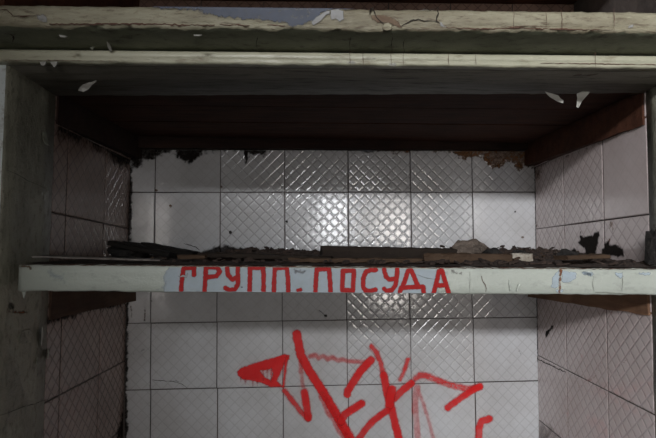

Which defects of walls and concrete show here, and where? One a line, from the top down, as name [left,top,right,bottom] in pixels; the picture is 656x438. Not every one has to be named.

peeling [154,6,349,27]
crack [391,7,598,65]
peeling [576,91,590,108]